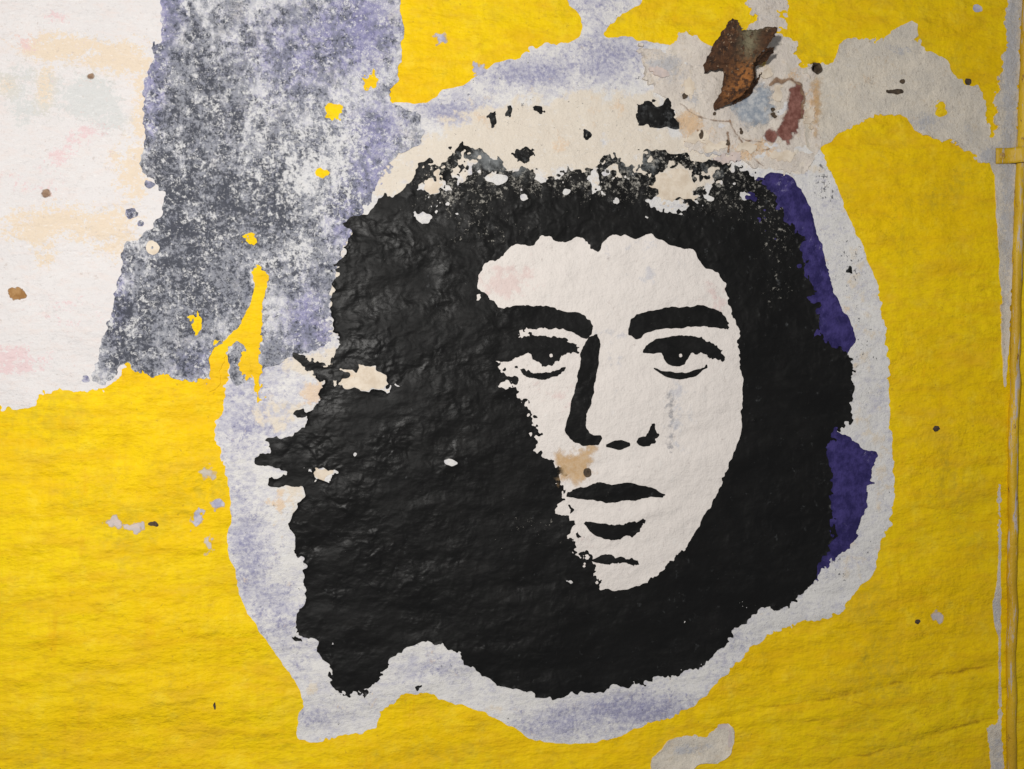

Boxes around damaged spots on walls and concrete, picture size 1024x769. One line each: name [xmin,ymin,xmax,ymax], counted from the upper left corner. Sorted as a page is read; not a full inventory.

rust [765,77,820,145]
peeling [424,169,443,194]
peeling [636,0,1022,387]
peeling [106,515,158,535]
peeling [190,499,225,526]
peeling [650,724,735,769]